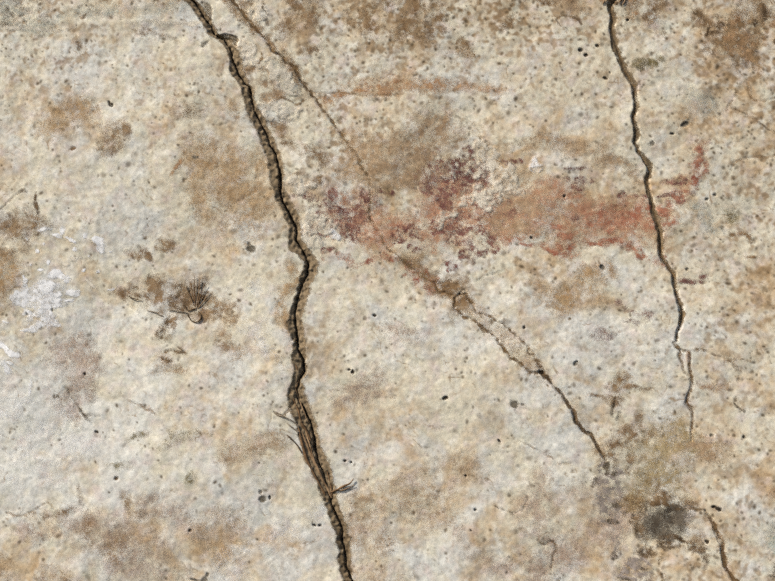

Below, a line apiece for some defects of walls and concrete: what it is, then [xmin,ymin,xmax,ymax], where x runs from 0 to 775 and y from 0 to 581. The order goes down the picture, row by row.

crack [160,347,188,363]
crack [185,0,614,581]
crack [607,0,752,438]
crack [689,508,743,581]